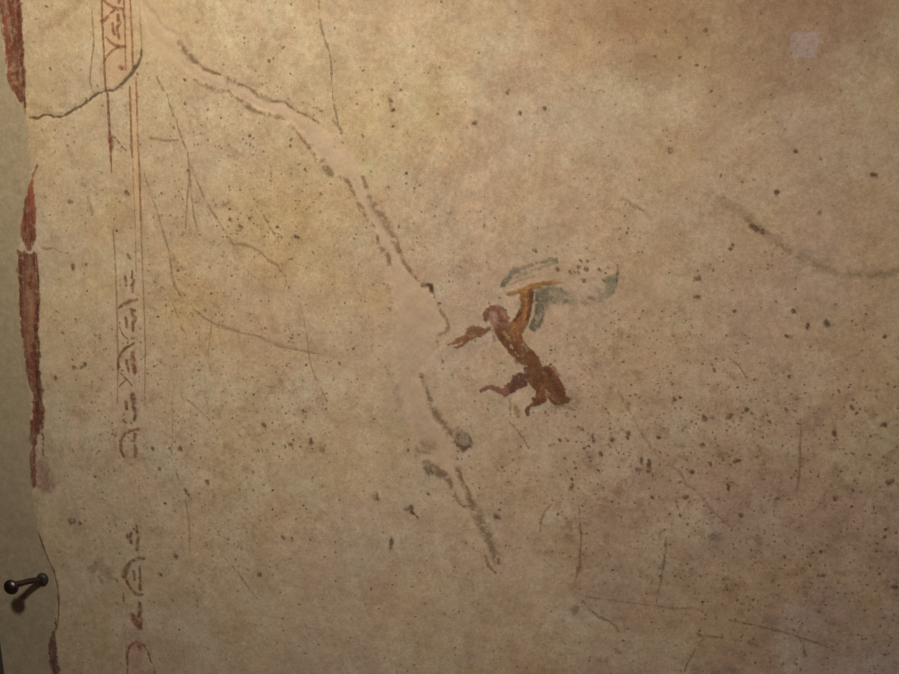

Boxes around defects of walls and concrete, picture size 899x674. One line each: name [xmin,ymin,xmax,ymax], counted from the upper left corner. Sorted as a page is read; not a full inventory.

crack [29,6,499,572]